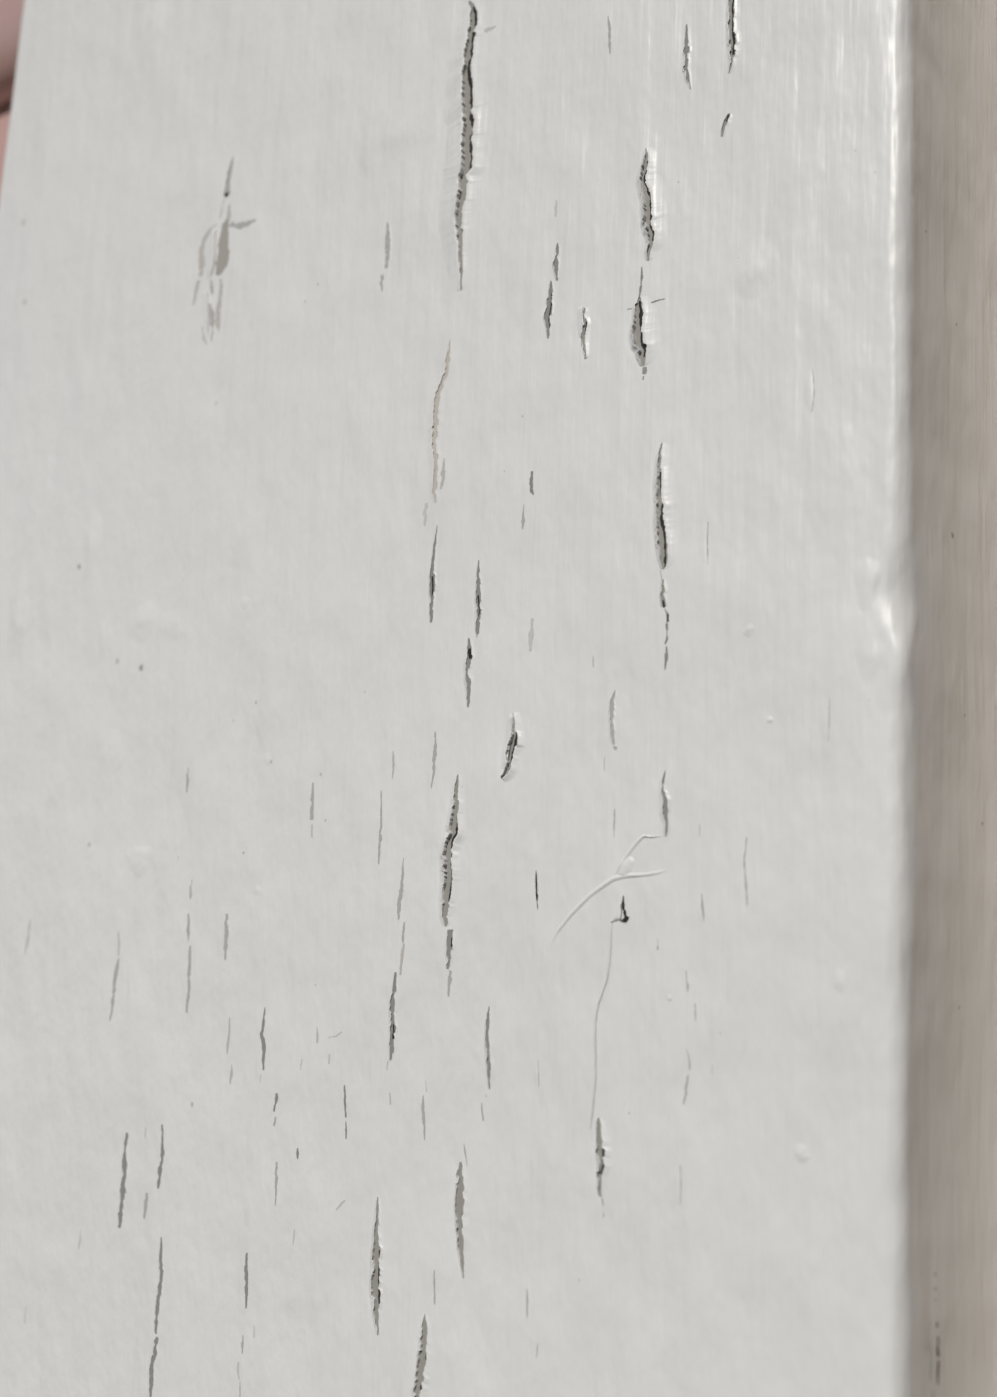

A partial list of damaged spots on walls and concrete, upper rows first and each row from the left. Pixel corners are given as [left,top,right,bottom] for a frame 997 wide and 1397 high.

peeling [206,228,217,278]
crack [438,0,495,292]
crack [542,200,592,359]
crack [628,147,668,380]
crack [725,0,742,73]
crack [463,560,485,707]
crack [652,443,680,670]
crack [500,712,526,783]
crack [378,751,427,1140]
crack [431,731,469,997]
crack [336,1197,384,1335]
crack [411,1006,495,1397]